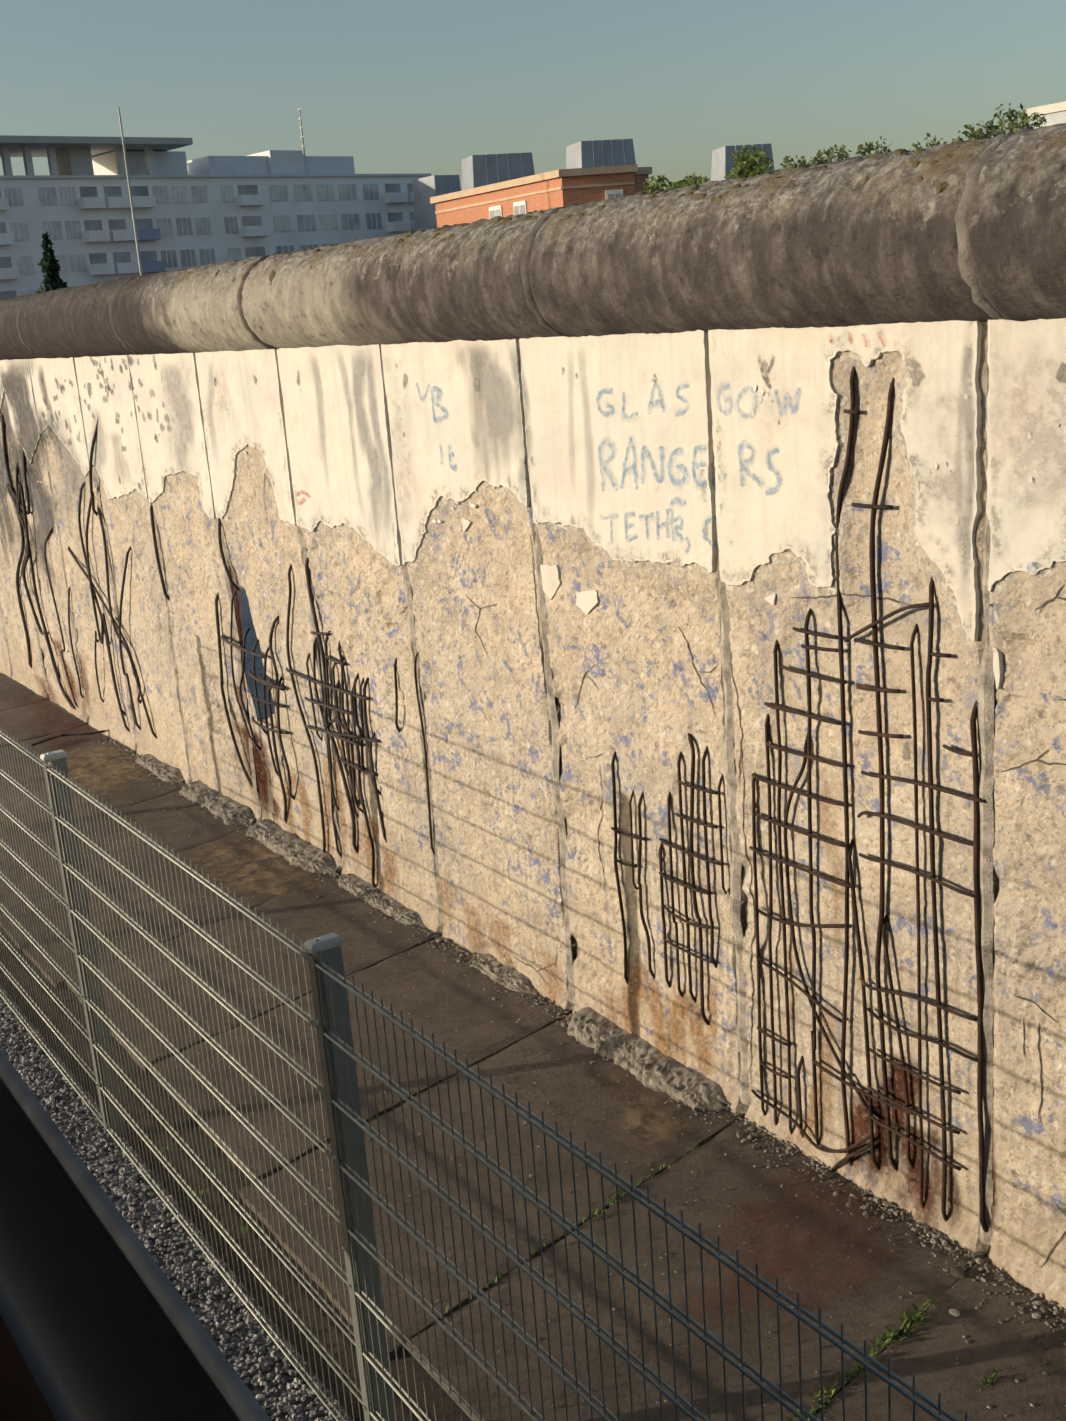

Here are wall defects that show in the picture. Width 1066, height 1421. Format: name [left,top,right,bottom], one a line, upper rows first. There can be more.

damp [0,370,81,580]
damp [354,362,381,502]
damp [471,354,524,441]
rust [40,641,88,703]
rust [227,560,243,652]
rust [236,688,308,837]
rust [324,745,395,890]
spalling [0,322,1066,1311]
rust [622,967,715,1070]
rust [807,1094,821,1135]
rust [850,1058,957,1224]